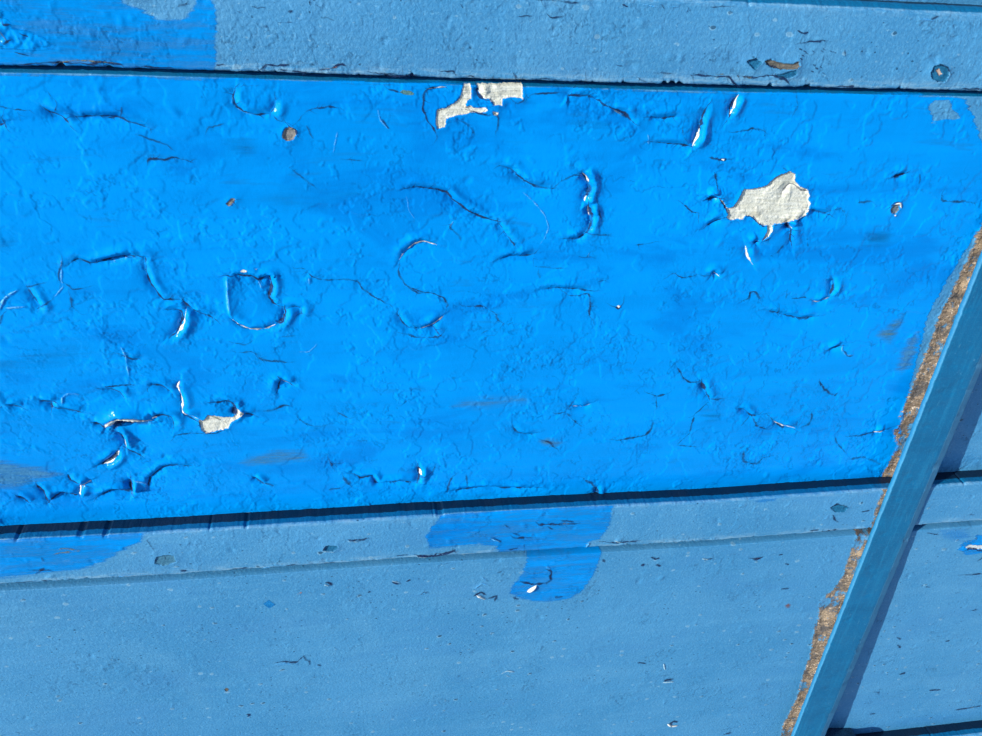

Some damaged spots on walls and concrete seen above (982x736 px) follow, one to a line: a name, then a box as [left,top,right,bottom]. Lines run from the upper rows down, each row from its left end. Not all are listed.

crack [0,94,188,163]
crack [260,63,474,140]
peeling [436,82,524,129]
crack [513,30,854,147]
crack [297,165,603,338]
peeling [720,171,810,262]
crack [26,255,216,336]
crack [749,279,834,319]
peeling [92,381,253,435]
crack [677,368,719,447]
crack [18,430,187,503]
crack [330,462,425,489]